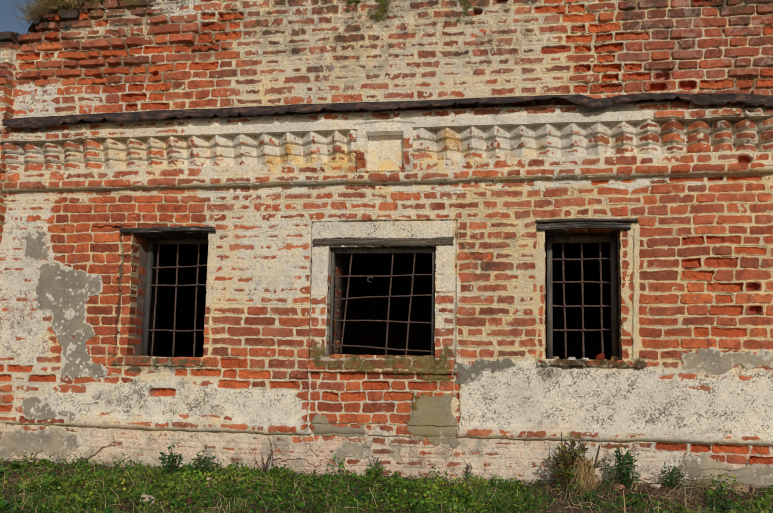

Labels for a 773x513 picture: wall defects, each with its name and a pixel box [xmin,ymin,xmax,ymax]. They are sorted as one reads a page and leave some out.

leakage [369,0,396,22]
spalling [2,0,246,112]
peeling [17,85,86,117]
spalling [532,155,773,192]
peeling [229,178,510,203]
peeling [0,205,312,427]
leakage [309,342,328,363]
leakage [419,344,452,386]
peeling [459,229,773,480]
spalling [322,370,438,402]
crack [265,437,332,469]
peeling [277,435,344,457]